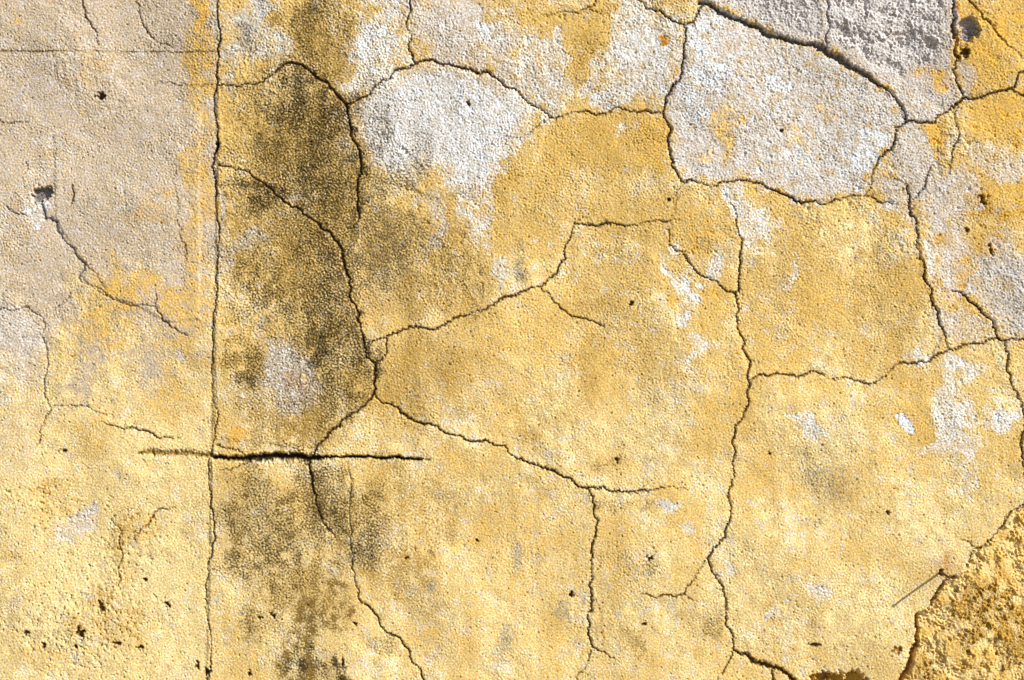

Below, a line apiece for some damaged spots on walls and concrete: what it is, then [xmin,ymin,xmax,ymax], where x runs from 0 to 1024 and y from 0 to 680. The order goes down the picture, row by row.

crack [0,0,346,143]
leakage [565,22,608,85]
leakage [562,109,625,186]
crack [0,293,181,447]
crack [39,203,187,336]
leakage [198,0,533,680]
crack [136,149,689,680]
leakage [512,424,547,457]
leakage [539,285,623,410]
crack [344,0,1024,680]
crack [110,507,176,586]
flaking render [897,505,1024,680]